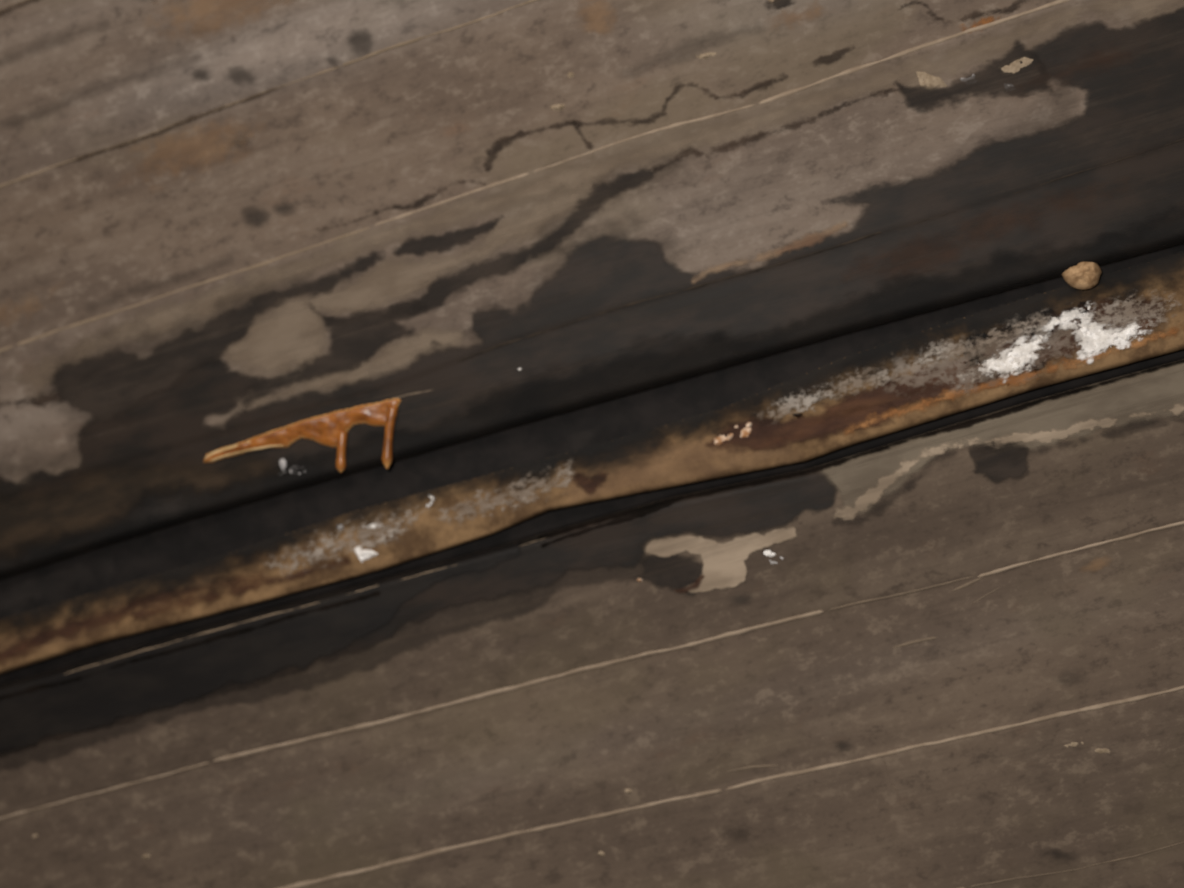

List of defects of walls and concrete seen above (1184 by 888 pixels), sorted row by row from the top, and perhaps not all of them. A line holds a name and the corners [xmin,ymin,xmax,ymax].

peeling [916,71,947,89]
peeling [1001,57,1033,86]
water stain [0,0,1184,559]
rust [708,298,1178,450]
rust [574,473,606,493]
water stain [0,362,1184,756]
peeling [646,527,796,593]